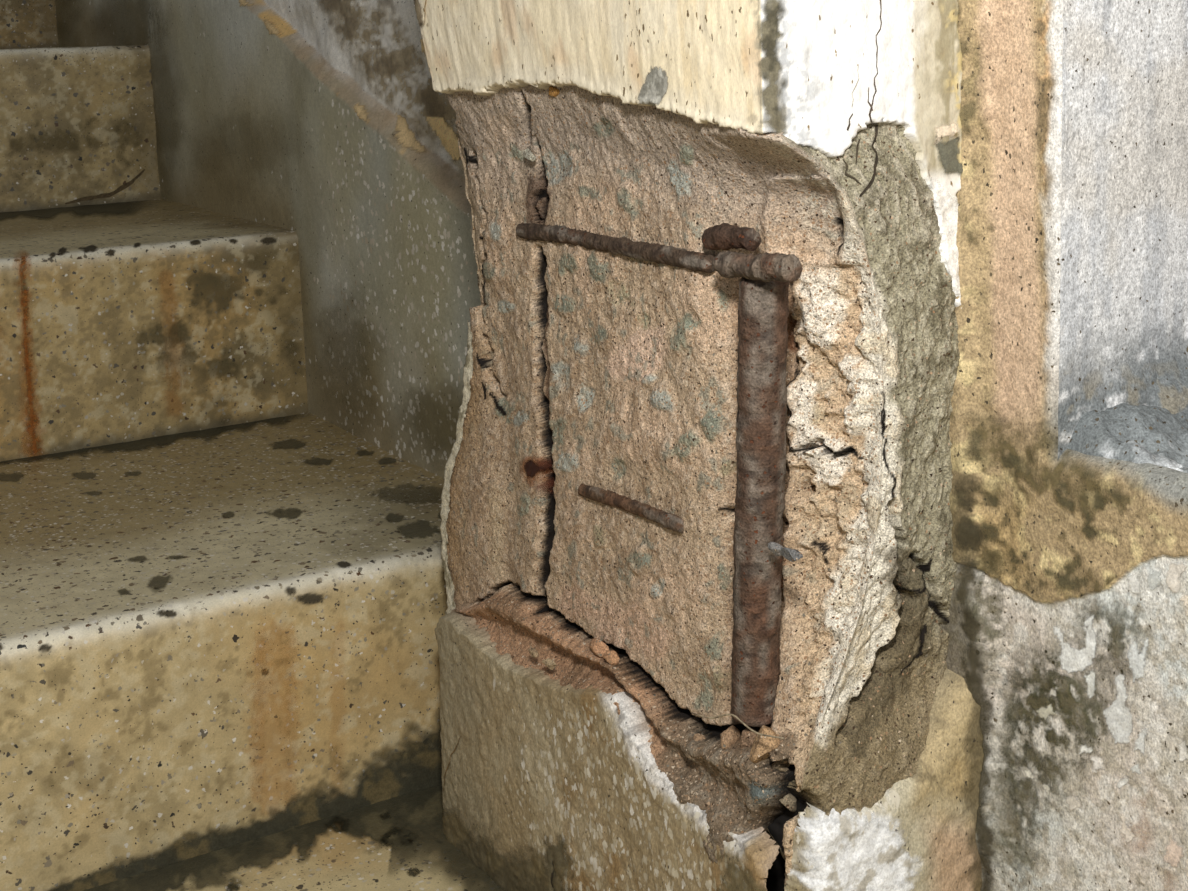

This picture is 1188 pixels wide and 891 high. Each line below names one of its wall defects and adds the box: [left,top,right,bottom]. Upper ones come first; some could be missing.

spalling [414,0,425,53]
peeling [396,115,425,152]
crack [836,0,882,255]
corrosion [20,256,41,454]
corrosion [524,458,556,492]
crack [484,167,771,740]
spalling [427,67,963,891]
crack [786,346,896,499]
leakage [50,725,571,891]
crack [764,761,810,891]
leakage [957,487,1027,891]
leakage [1005,655,1105,807]